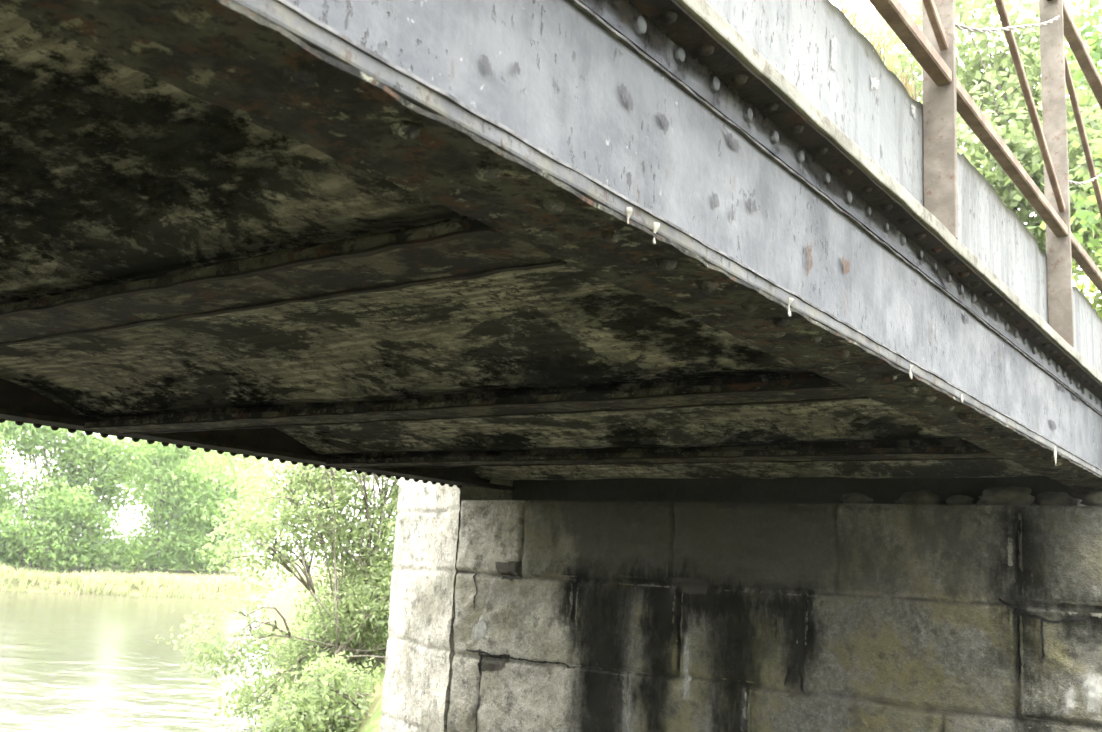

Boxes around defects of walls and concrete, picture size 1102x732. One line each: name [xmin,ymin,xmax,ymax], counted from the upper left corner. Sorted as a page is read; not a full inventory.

damp [0,41,306,302]
damp [459,284,801,393]
damp [452,423,558,453]
damp [596,423,680,449]
damp [704,419,806,447]
damp [842,415,943,443]
damp [995,510,1046,679]
damp [1061,599,1102,639]
damp [559,569,817,732]
damp [1063,675,1102,713]